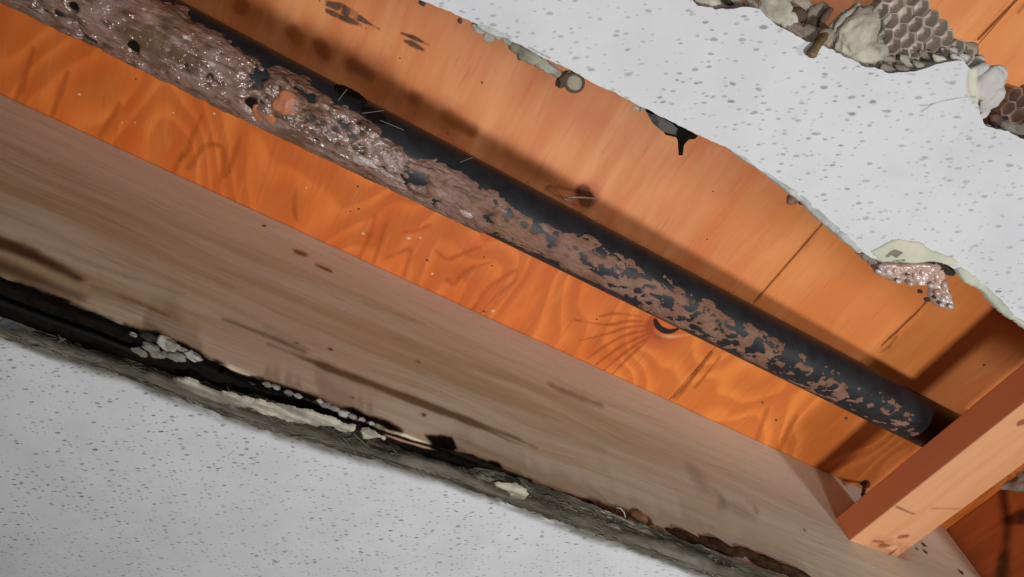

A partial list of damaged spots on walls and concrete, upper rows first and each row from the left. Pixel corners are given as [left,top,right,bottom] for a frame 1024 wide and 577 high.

flaking render [972,61,1008,127]
spalling [871,238,958,266]
peeling [173,377,386,440]
water stain [0,263,652,525]